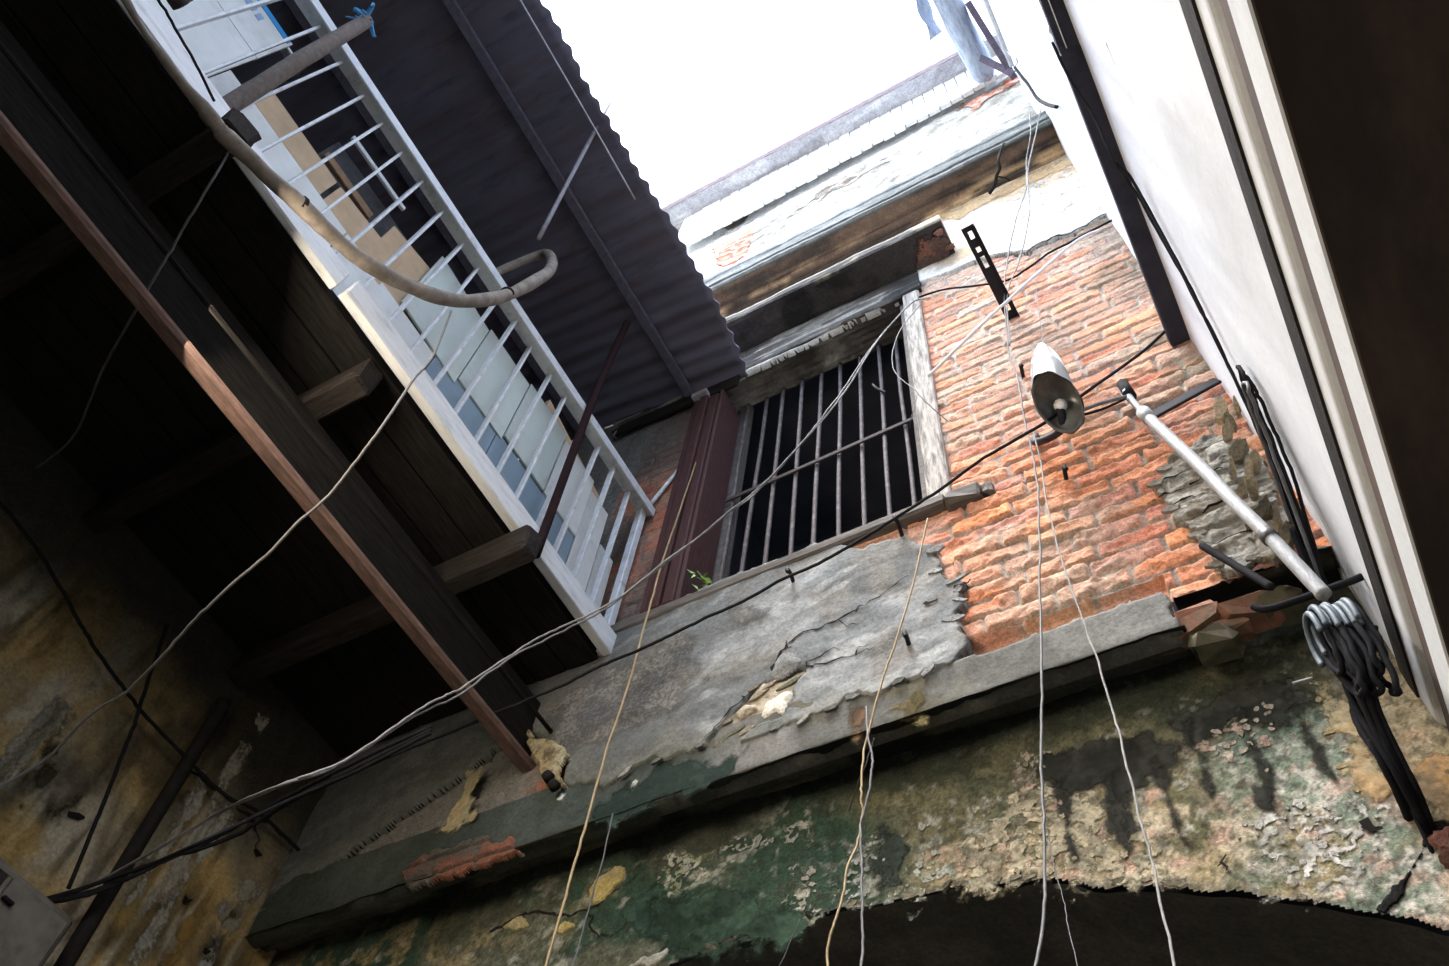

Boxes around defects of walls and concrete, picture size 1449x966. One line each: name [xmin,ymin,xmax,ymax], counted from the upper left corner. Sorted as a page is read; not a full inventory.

peeling [1146,395,1294,580]
leakage [0,698,76,789]
flaking render [526,729,570,793]
flaking render [693,671,862,750]
leakage [1036,673,1337,864]
peeling [1181,672,1395,902]
leakage [125,713,269,966]
flaking render [401,835,525,893]
peeling [587,866,626,906]
peeling [657,821,814,898]
peeling [781,749,1188,925]
spalling [1376,819,1449,914]